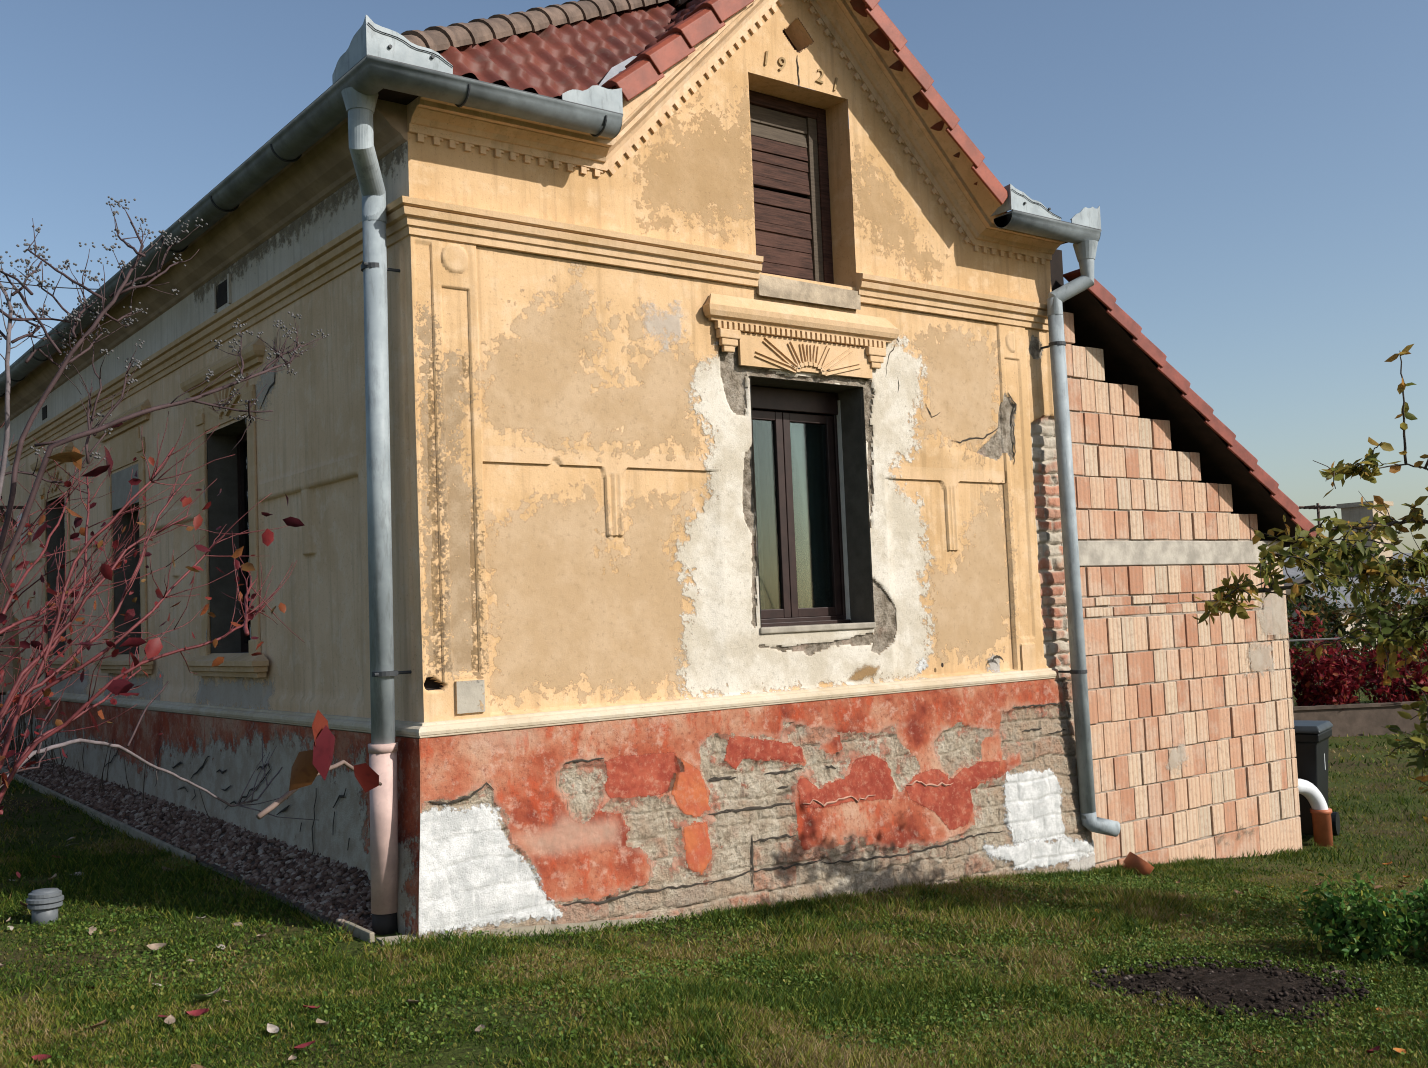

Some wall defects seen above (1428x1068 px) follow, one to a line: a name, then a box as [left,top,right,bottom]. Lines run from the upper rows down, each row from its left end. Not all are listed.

spalling [10,714,371,884]
spalling [397,261,1092,937]